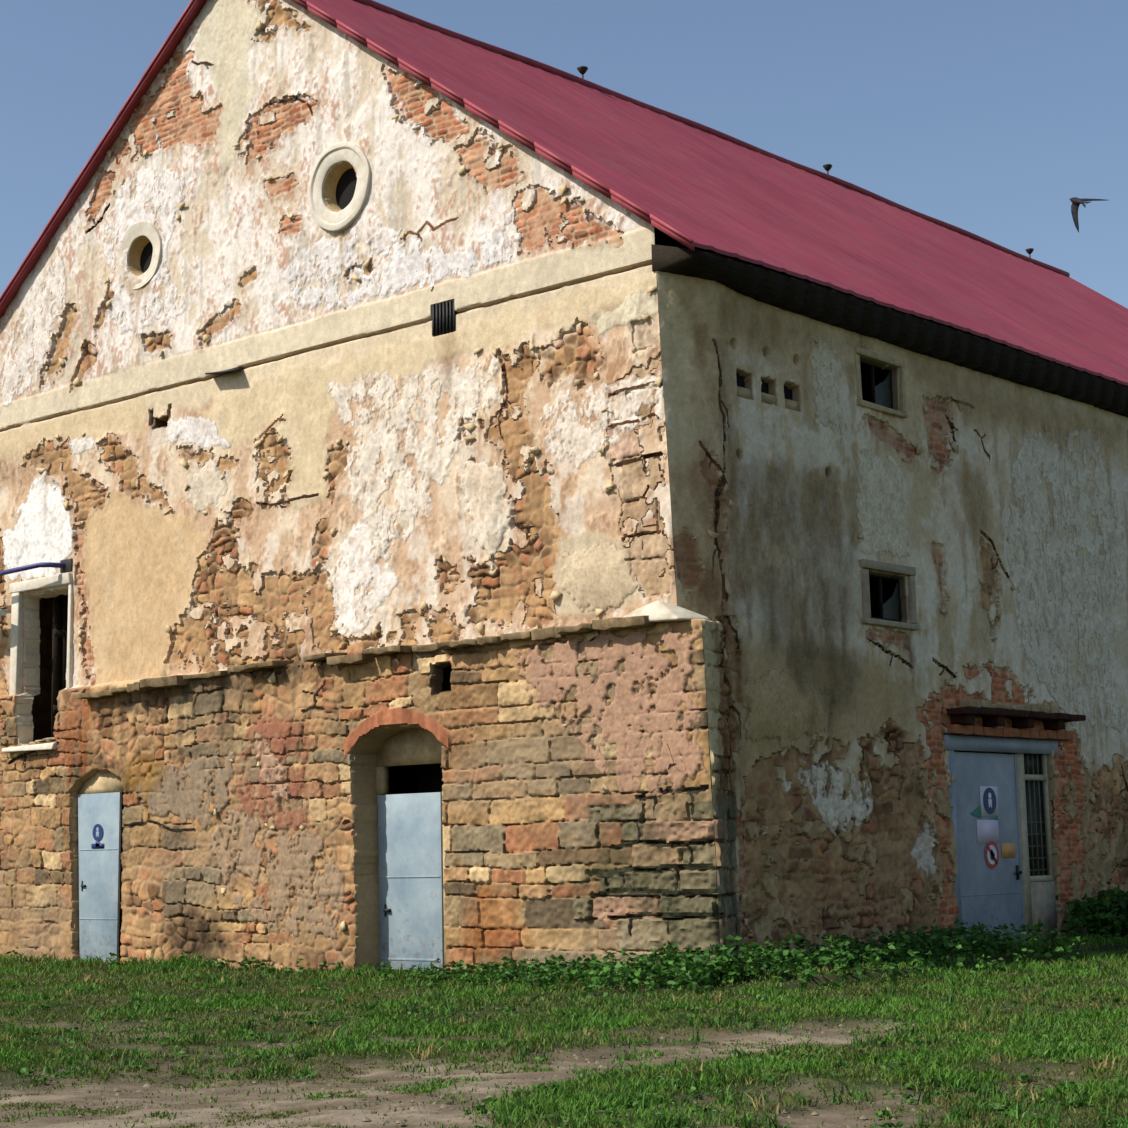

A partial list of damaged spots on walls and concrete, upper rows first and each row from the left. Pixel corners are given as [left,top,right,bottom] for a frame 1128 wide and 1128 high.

flaking render [0,51,223,406]
flaking render [231,95,318,167]
crack [401,217,458,241]
flaking render [279,65,624,314]
flaking render [0,433,175,697]
flaking render [165,285,734,797]
crack [589,340,741,933]
flaking render [712,615,739,751]
damp [749,471,842,629]
flaking render [856,396,959,558]
crack [866,637,956,678]
flaking render [735,425,1128,963]